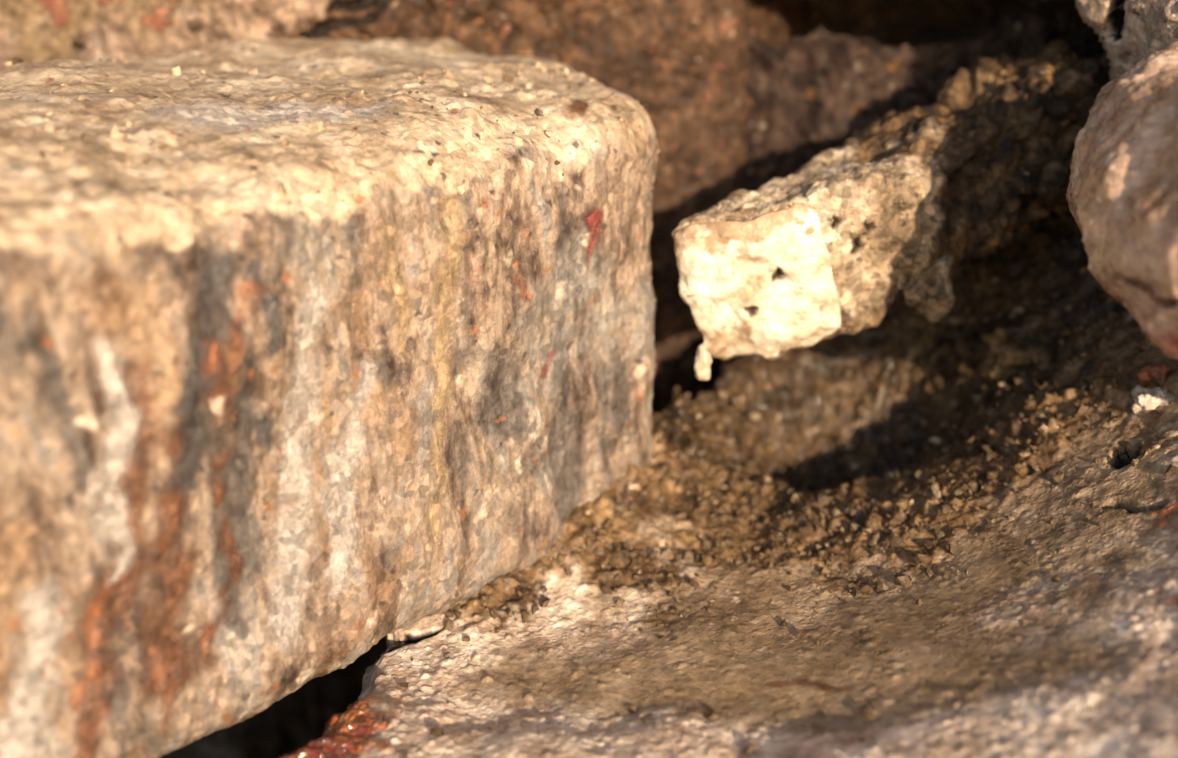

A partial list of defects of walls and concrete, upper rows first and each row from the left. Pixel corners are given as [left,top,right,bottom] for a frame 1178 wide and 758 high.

crack [1110,0,1126,37]
corrosion [279,695,399,758]